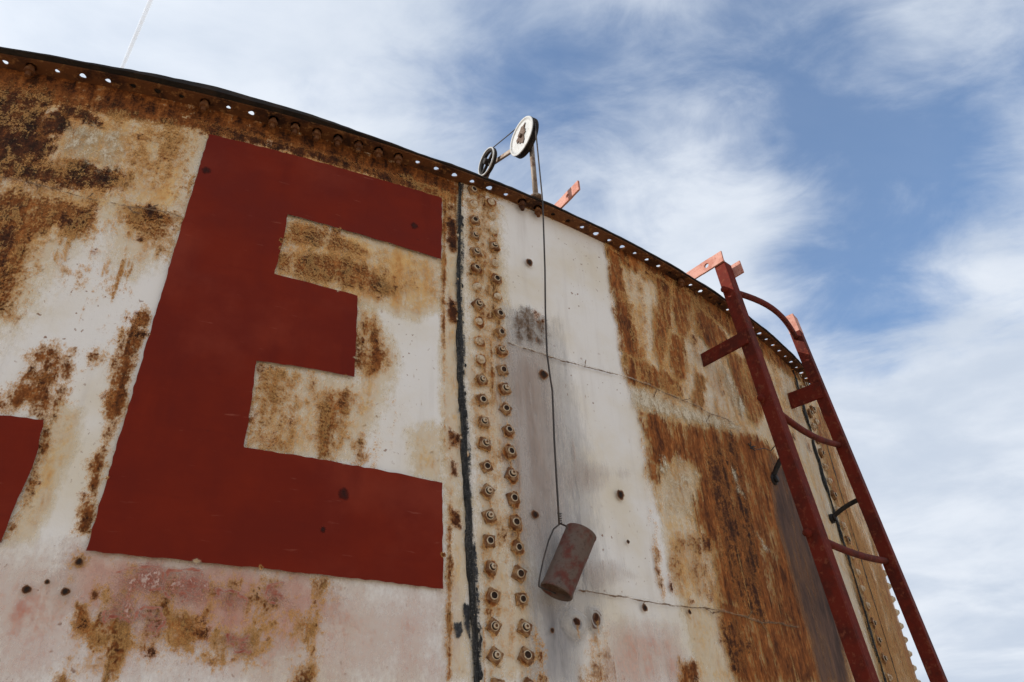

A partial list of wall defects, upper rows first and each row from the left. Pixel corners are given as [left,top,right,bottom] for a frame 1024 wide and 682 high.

corrosion [0,68,554,682]
corrosion [605,243,832,682]